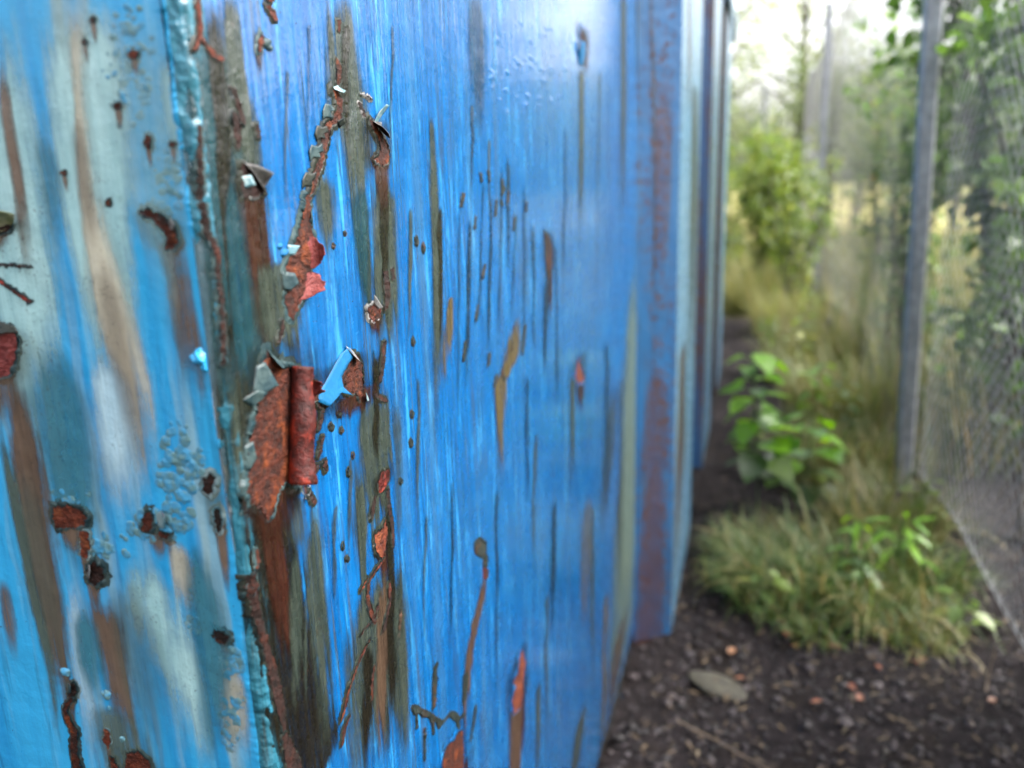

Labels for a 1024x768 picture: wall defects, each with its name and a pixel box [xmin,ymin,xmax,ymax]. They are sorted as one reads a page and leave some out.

peeling [235,159,274,230]
peeling [280,82,346,325]
peeling [366,104,390,207]
peeling [364,295,383,332]
rust [543,229,553,313]
peeling [198,342,376,579]
rust [11,392,95,694]
rust [260,520,291,648]
rust [371,467,403,737]
rust [463,540,489,726]
rust [509,708,522,768]